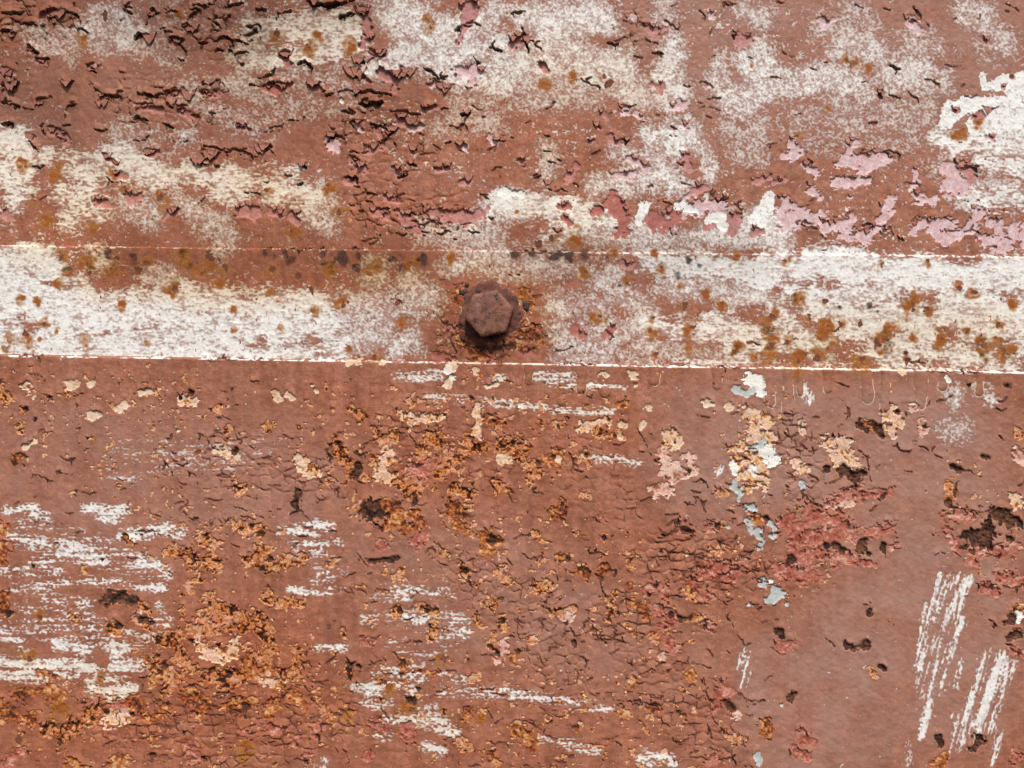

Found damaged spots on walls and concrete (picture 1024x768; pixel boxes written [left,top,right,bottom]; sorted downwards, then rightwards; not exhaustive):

rust [1,294,58,353]
rust [163,179,606,368]
peeling [0,0,1024,449]
rust [642,237,715,385]
rust [722,290,1018,470]
rust [291,451,323,511]
rust [328,370,565,587]
peeling [729,438,782,551]
spalling [823,464,867,486]
spalling [830,538,887,558]
spalling [959,506,1023,555]
rust [0,517,356,768]